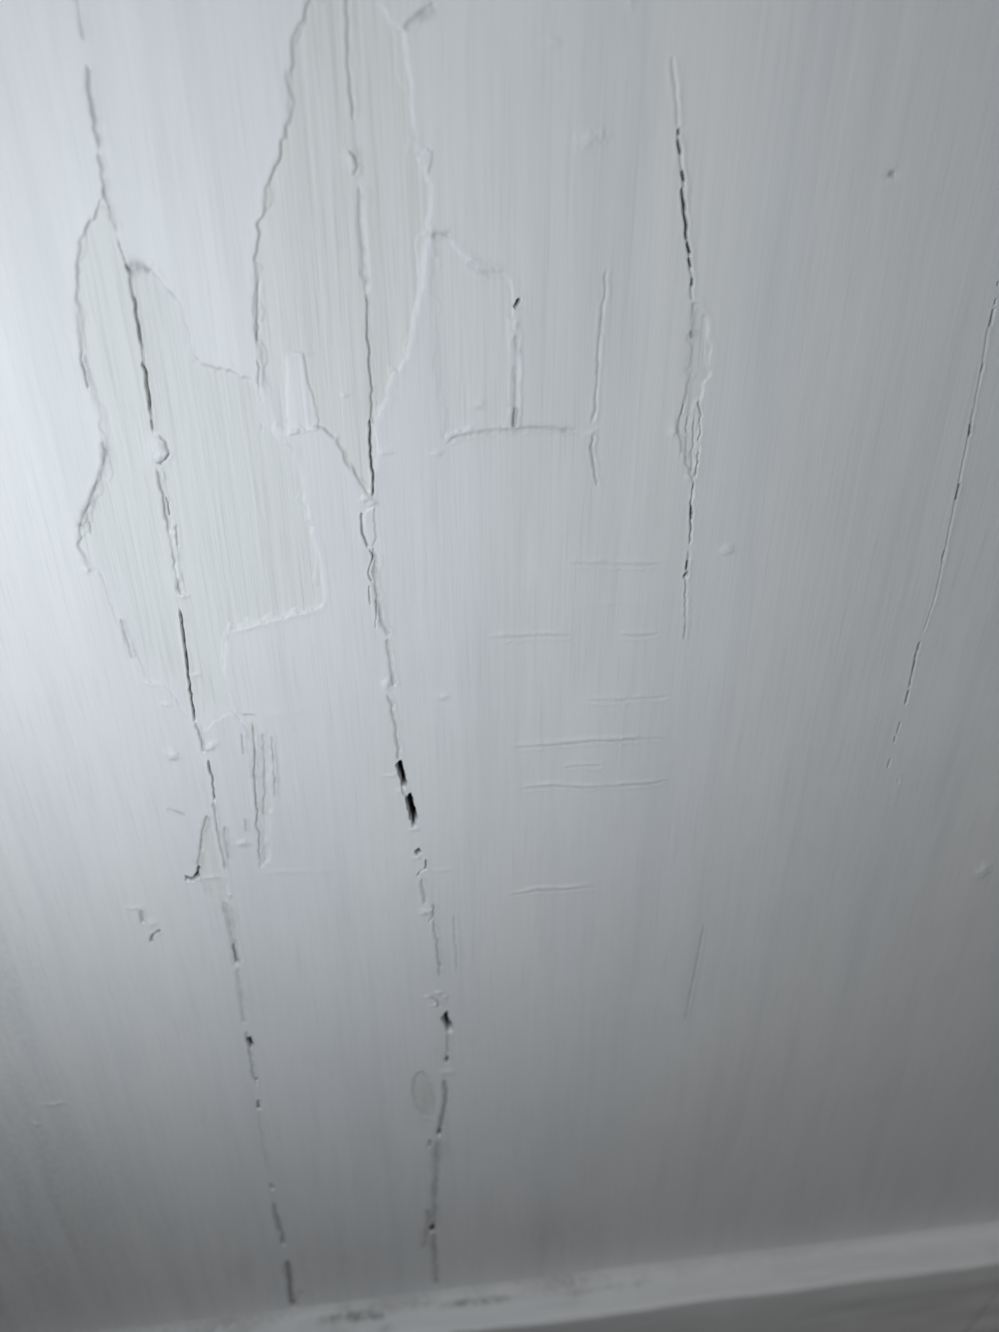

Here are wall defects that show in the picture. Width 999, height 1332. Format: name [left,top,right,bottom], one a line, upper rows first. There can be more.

crack [71,0,306,1305]
crack [342,0,461,1287]
crack [508,295,524,435]
crack [668,47,699,305]
crack [681,474,699,645]
crack [885,276,999,811]